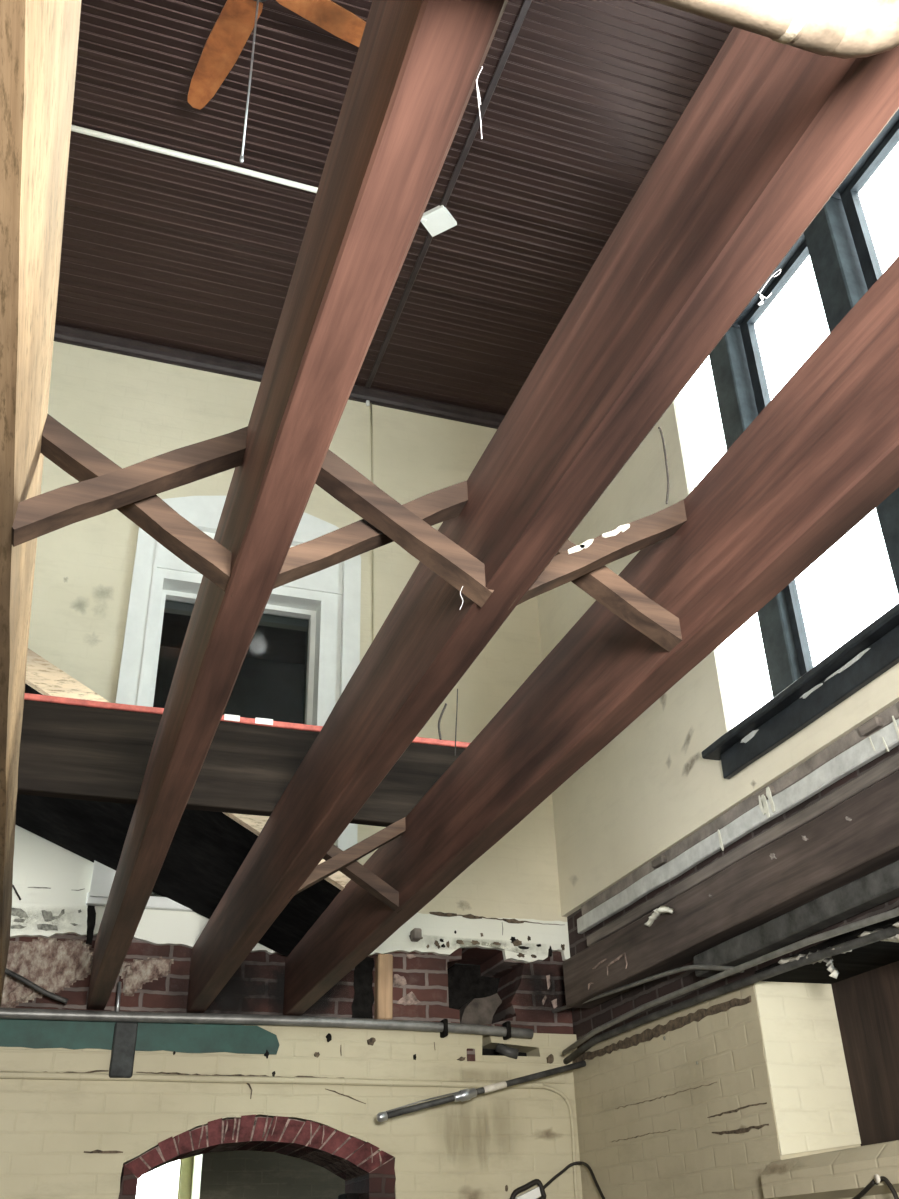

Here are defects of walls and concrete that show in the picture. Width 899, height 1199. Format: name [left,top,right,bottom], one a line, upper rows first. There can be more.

spalling [0,908,94,1008]
peeling [409,930,565,958]
spalling [447,964,502,1025]
crack [617,1082,716,1109]
crack [707,1102,769,1135]
crack [612,1129,676,1142]